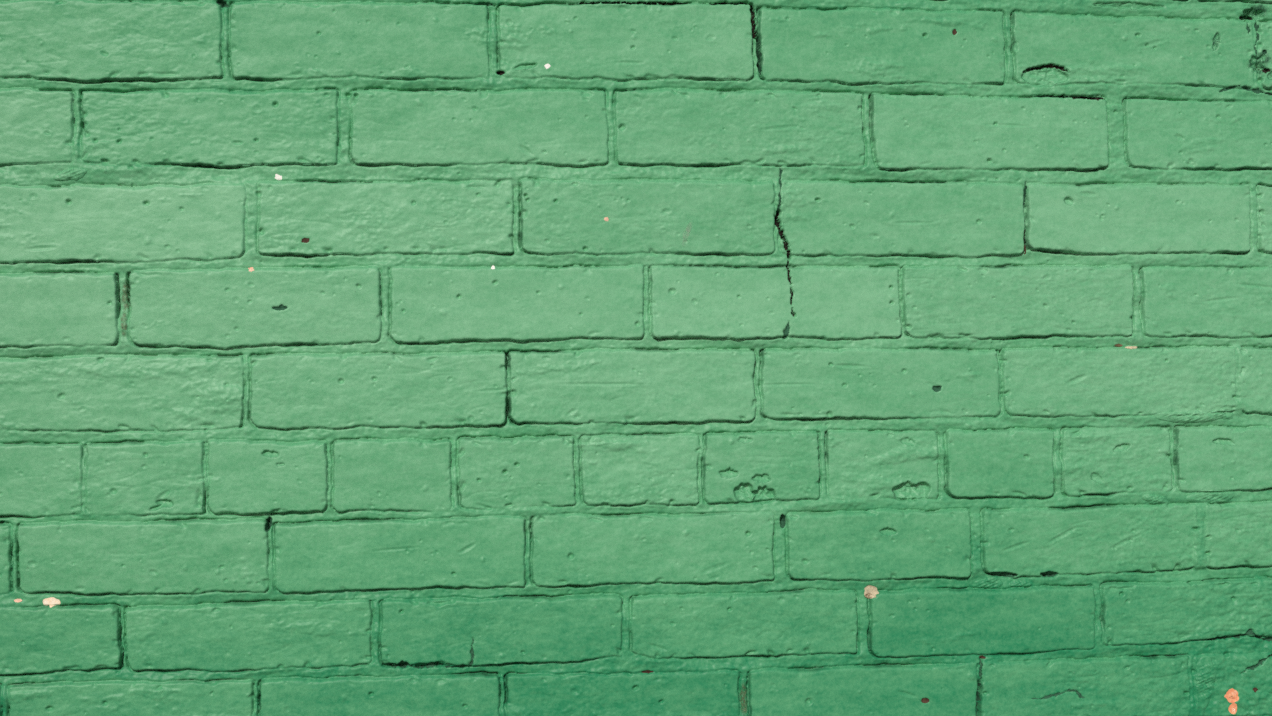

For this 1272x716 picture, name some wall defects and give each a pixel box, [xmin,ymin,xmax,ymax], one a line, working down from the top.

crack [774,168,794,339]
crack [1206,629,1272,672]
peeling [1224,688,1239,714]